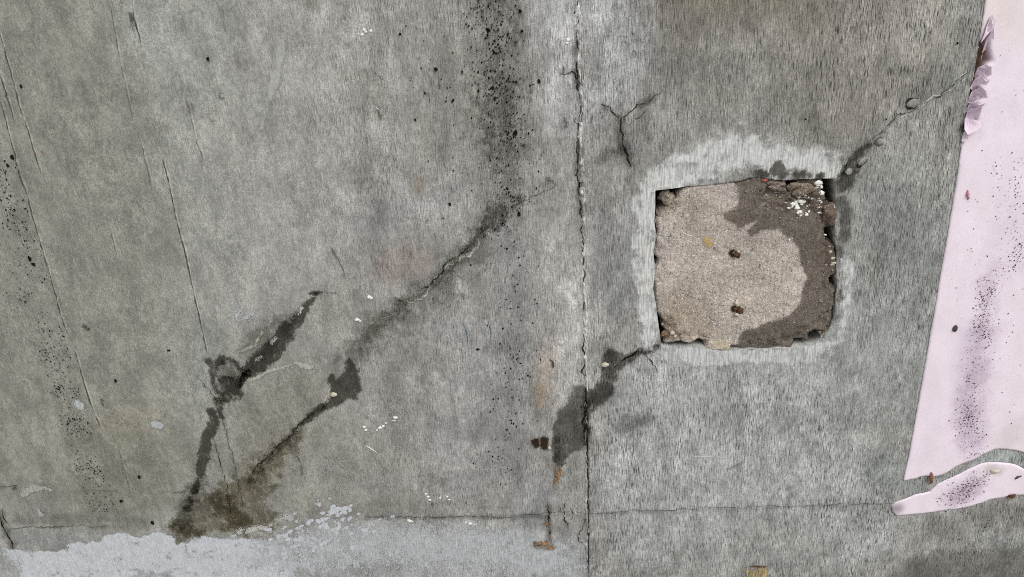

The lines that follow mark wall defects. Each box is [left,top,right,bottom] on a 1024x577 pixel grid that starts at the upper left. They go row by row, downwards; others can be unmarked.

crack [600,93,660,166]
crack [869,71,967,142]
crack [385,235,480,320]
peeling [745,179,836,337]
leakage [183,291,322,512]
leakage [301,358,361,425]
corrosion [531,436,566,496]